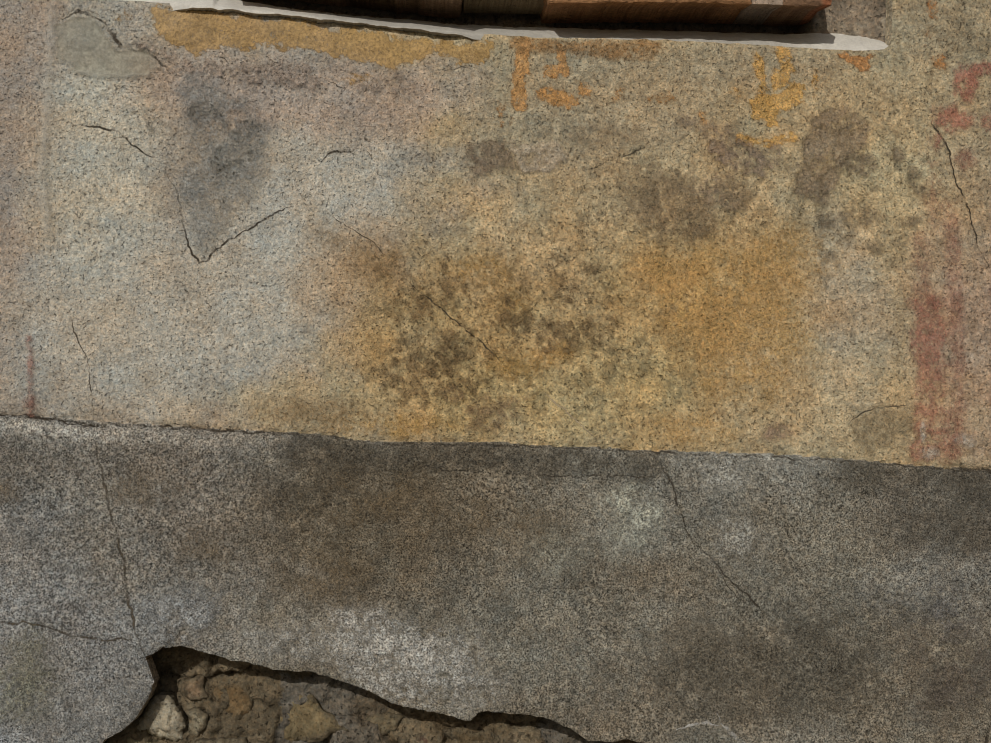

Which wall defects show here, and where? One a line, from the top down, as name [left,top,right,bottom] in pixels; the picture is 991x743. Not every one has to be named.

crack [86,125,152,157]
crack [183,207,288,264]
crack [931,122,991,271]
crack [72,322,92,392]
crack [143,424,340,438]
crack [384,393,596,472]
crack [619,435,991,536]
crack [0,414,145,655]
crack [709,555,765,614]
flaking render [104,646,642,743]